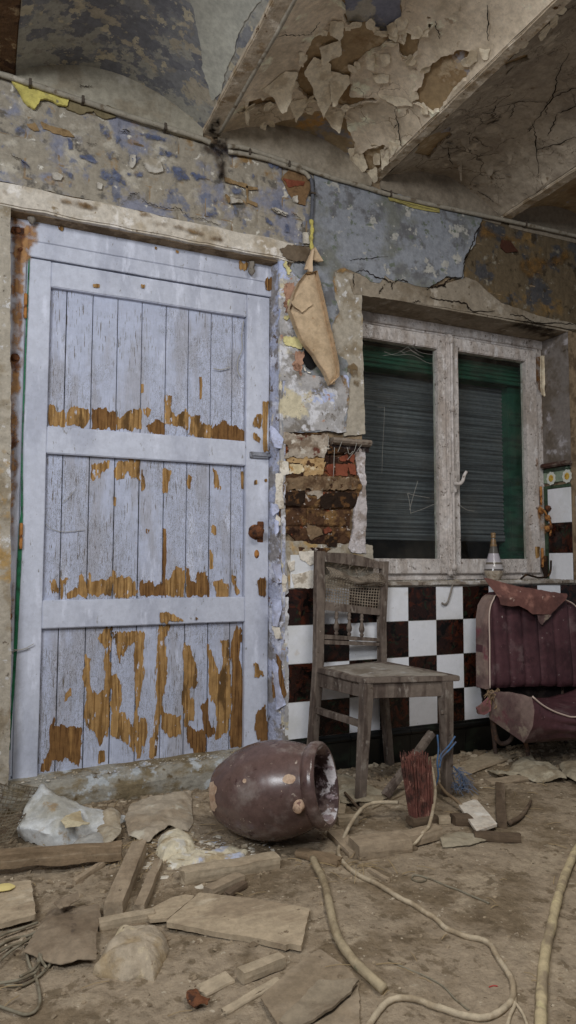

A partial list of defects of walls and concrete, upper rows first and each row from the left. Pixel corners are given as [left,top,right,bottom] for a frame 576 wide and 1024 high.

peeling [11,81,205,190]
spalling [207,175,258,216]
peeling [222,0,576,216]
crack [350,191,575,324]
crack [464,54,576,174]
spalling [283,336,316,376]
spalling [48,395,367,639]
peeling [41,612,286,772]